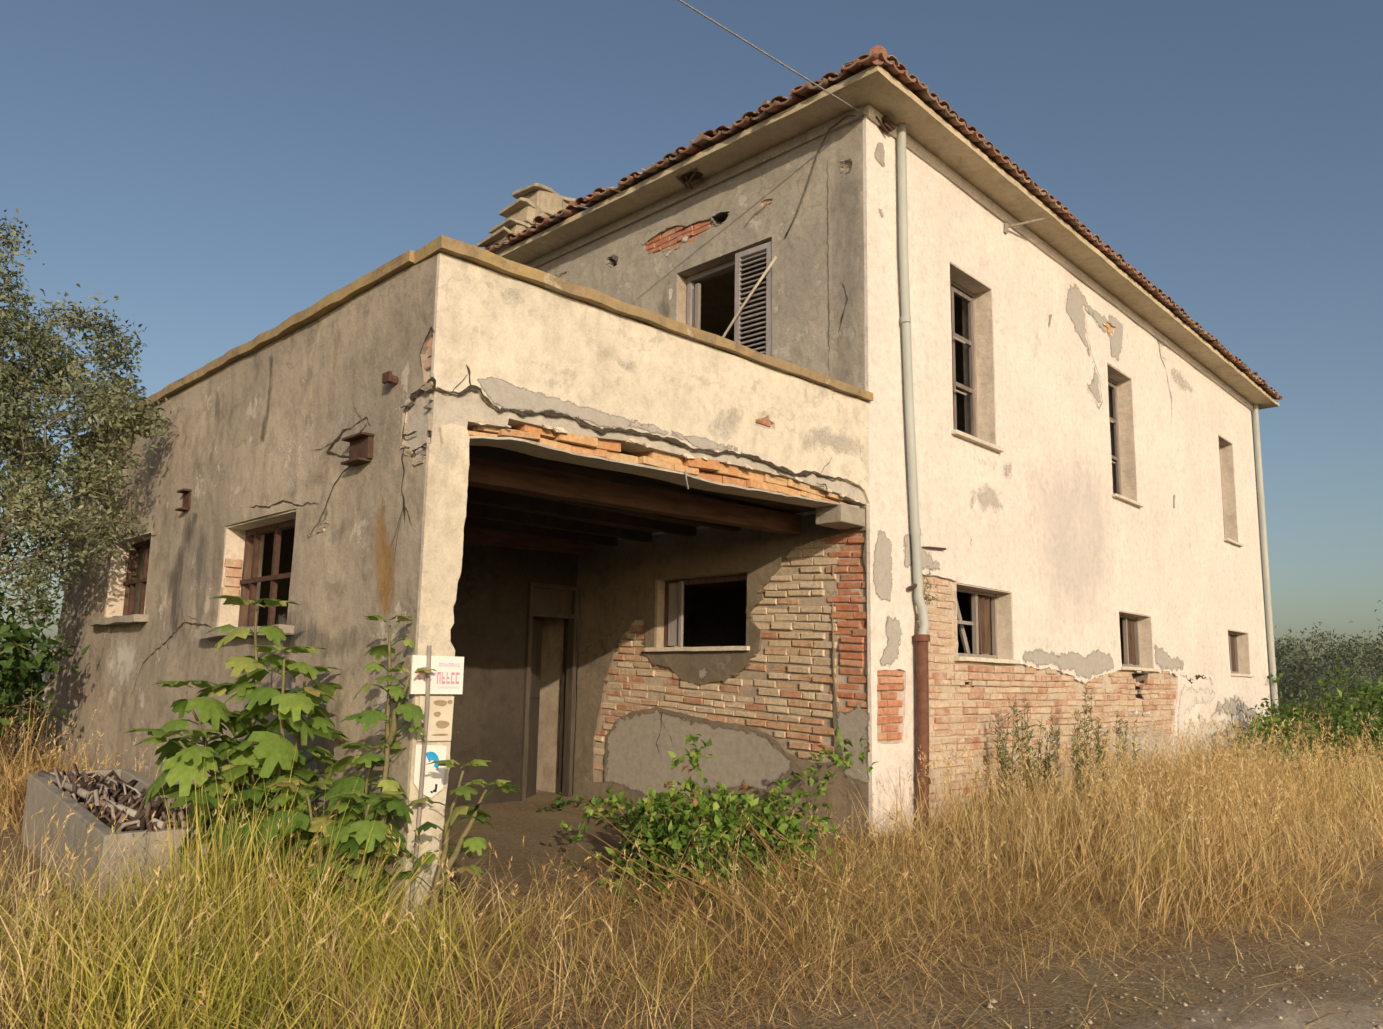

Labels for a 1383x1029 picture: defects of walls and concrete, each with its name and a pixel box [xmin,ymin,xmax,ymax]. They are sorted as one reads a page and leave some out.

spalling [642,212,730,256]
spalling [400,327,435,410]
spalling [1049,285,1124,408]
spalling [400,430,431,466]
spalling [467,377,860,508]
crack [129,603,212,699]
spalling [594,531,1262,825]